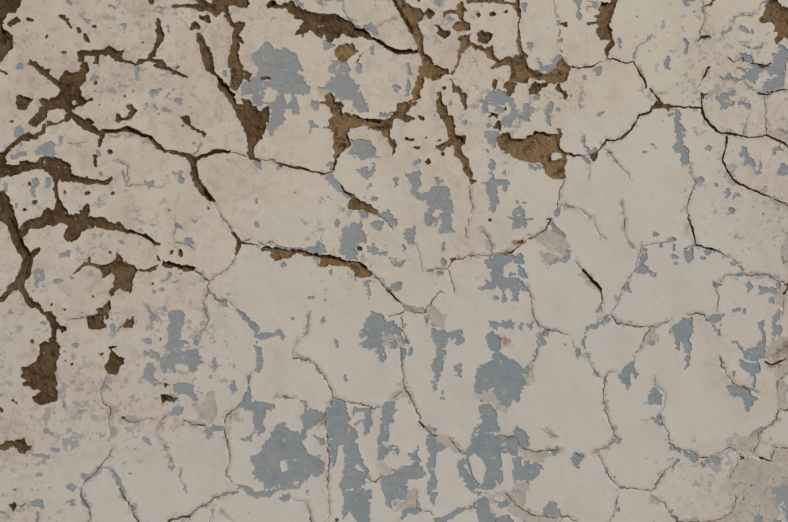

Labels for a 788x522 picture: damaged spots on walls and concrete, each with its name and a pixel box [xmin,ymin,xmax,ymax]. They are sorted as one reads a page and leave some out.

crack [0,0,21,75]
spalling [134,0,188,80]
crack [171,0,250,92]
flaking render [573,0,622,80]
flaking render [189,0,572,303]
crack [560,39,788,206]
flaking render [100,346,125,375]
flaking render [33,223,196,333]
crack [0,46,353,405]
crack [292,91,605,522]
crack [575,165,788,362]
flaking render [0,438,60,459]